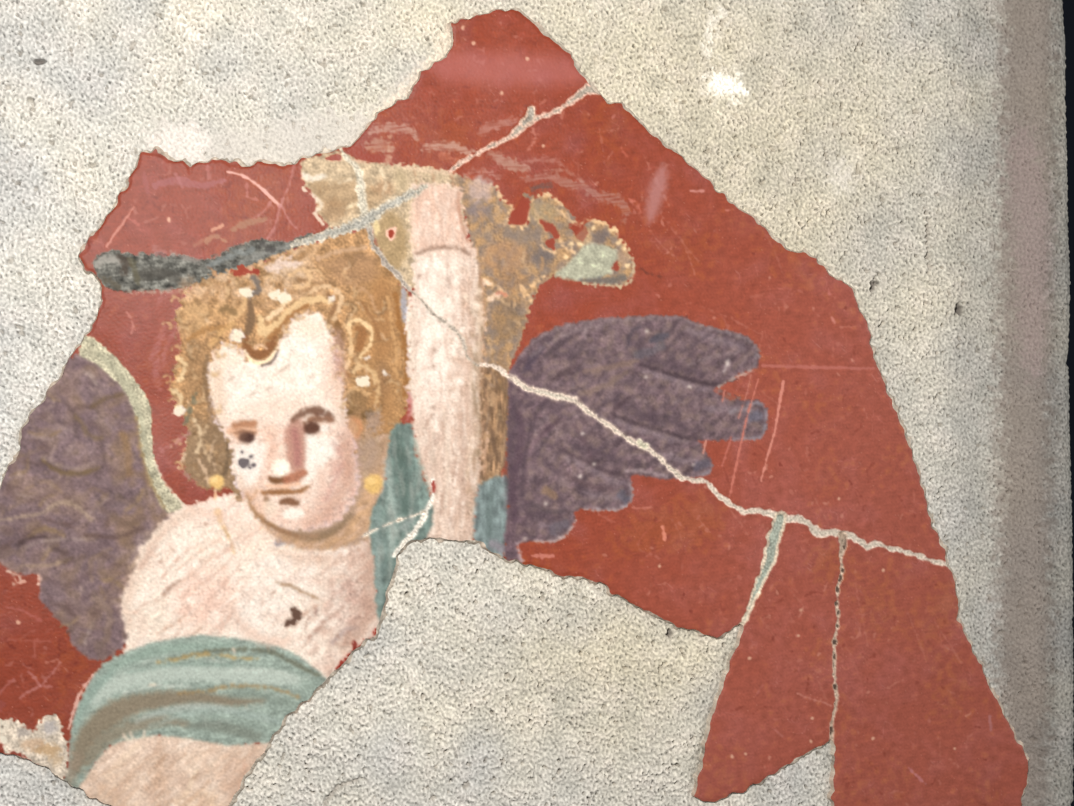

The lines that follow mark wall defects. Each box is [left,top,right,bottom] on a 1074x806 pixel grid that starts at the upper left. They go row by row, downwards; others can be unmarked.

crack [290,84,947,745]
peeling [0,714,69,780]